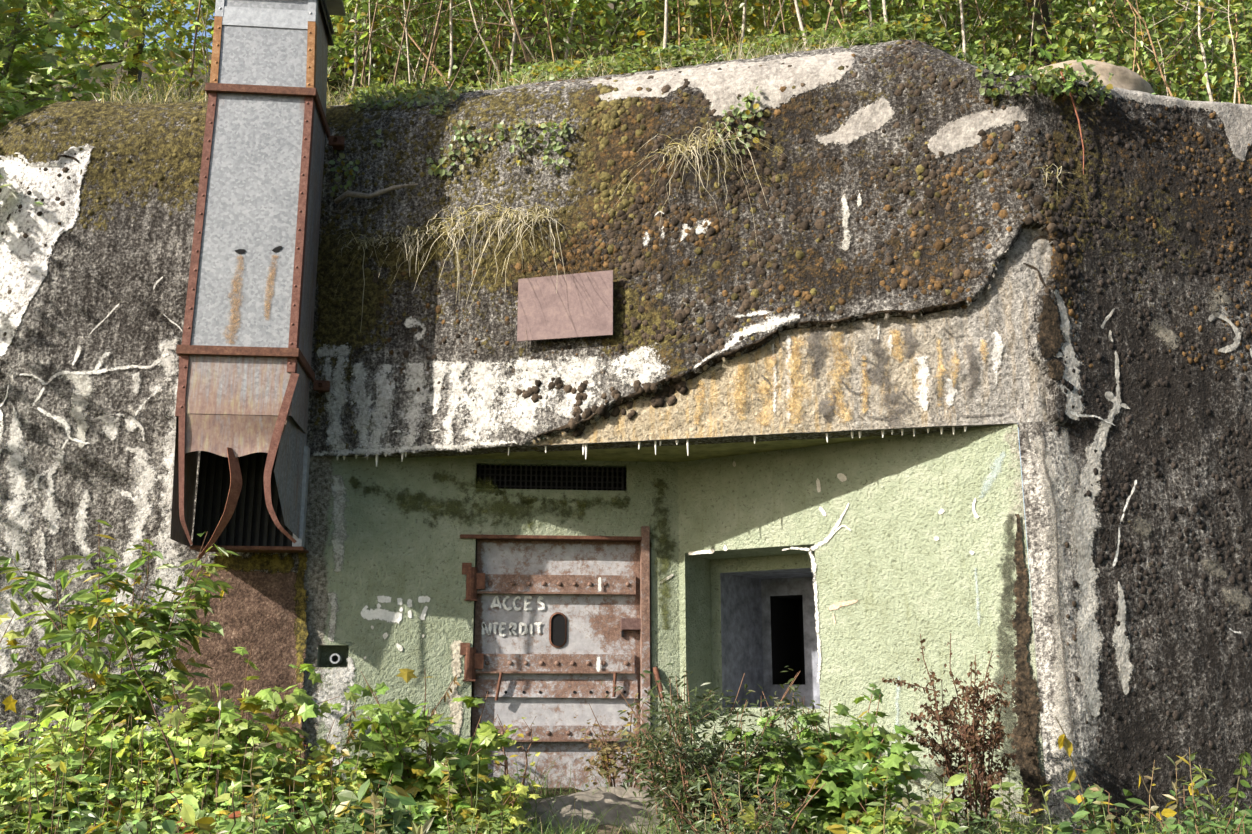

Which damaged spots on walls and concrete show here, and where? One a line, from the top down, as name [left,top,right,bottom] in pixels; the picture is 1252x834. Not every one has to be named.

spalling [0,144,94,356]
corrosion [265,255,278,317]
crack [1023,236,1058,291]
crack [0,277,182,449]
water stain [313,343,669,456]
water stain [694,310,800,420]
crack [536,300,965,438]
water stain [866,322,930,427]
water stain [945,331,1005,406]
water stain [329,471,630,572]
water stain [1069,308,1134,717]
crack [782,503,851,682]